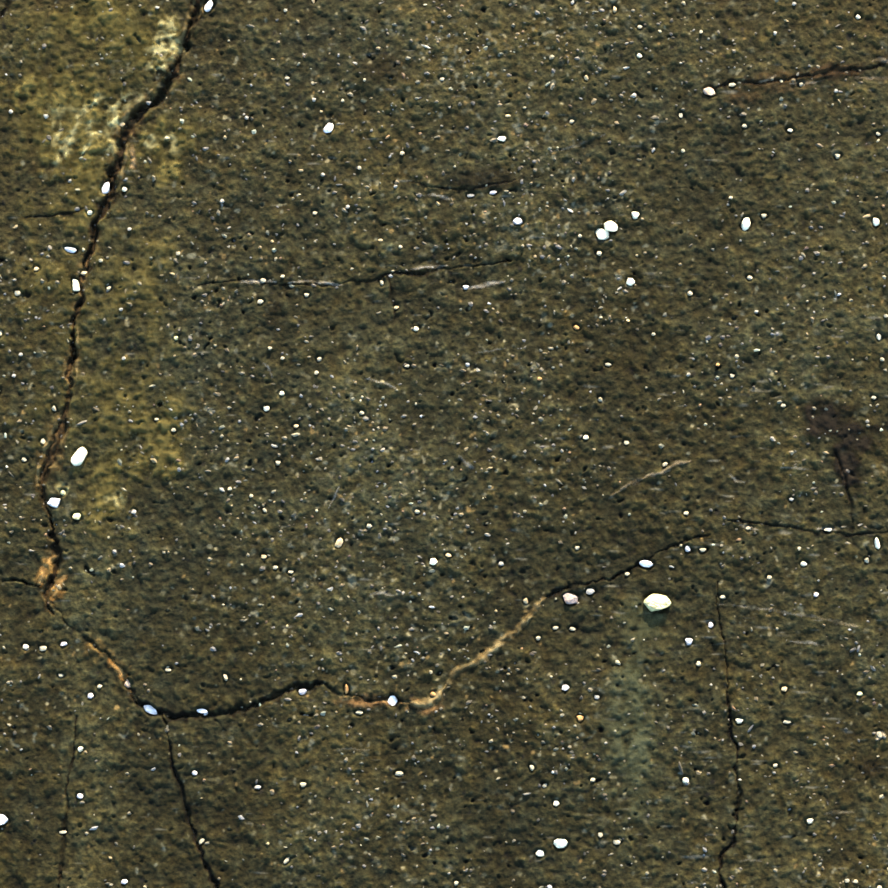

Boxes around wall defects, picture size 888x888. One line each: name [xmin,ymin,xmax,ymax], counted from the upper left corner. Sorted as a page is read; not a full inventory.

crack [166,0,203,77]
crack [238,278,337,286]
crack [381,265,447,290]
crack [468,260,507,289]
crack [11,88,153,615]
crack [647,462,685,476]
crack [398,558,650,708]
crack [720,627,739,781]
crack [66,718,77,787]
crack [128,680,326,888]
crack [718,811,738,888]